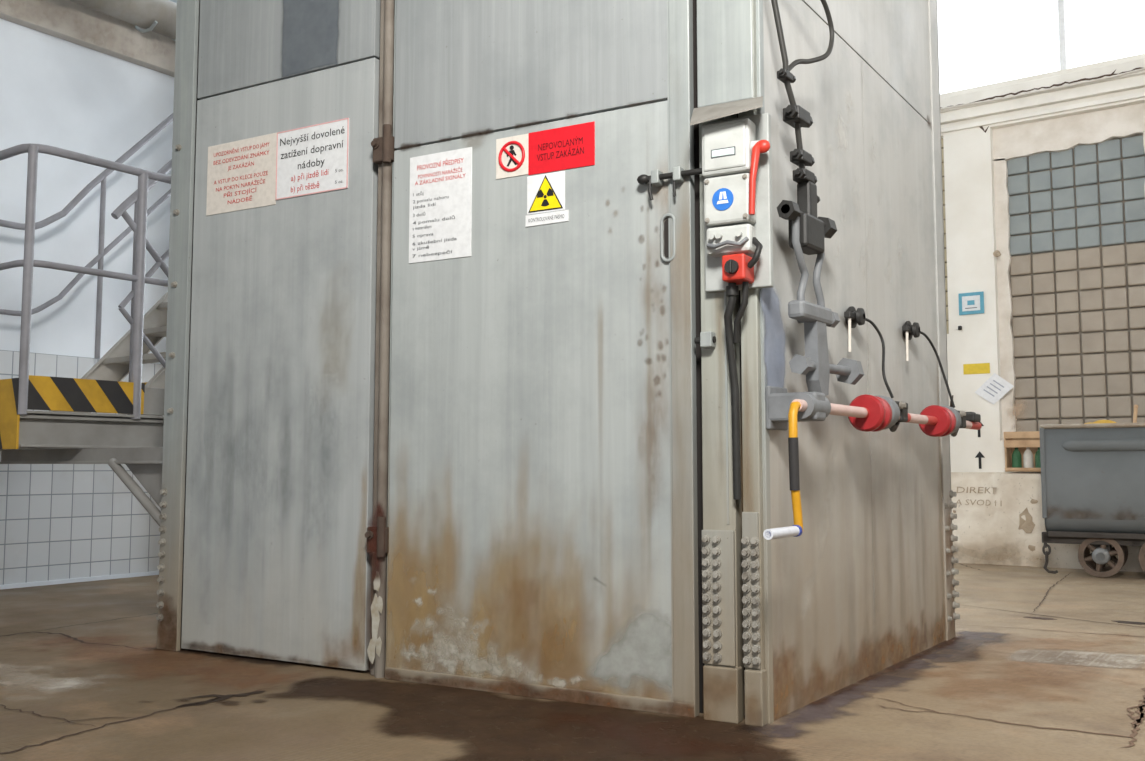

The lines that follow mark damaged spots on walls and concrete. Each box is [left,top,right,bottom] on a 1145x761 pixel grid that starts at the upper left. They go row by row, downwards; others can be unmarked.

corrosion [369,504,628,708]
crack [957,573,1145,637]
damp [255,631,1007,761]
corrosion [774,618,953,720]
crack [846,688,1145,748]